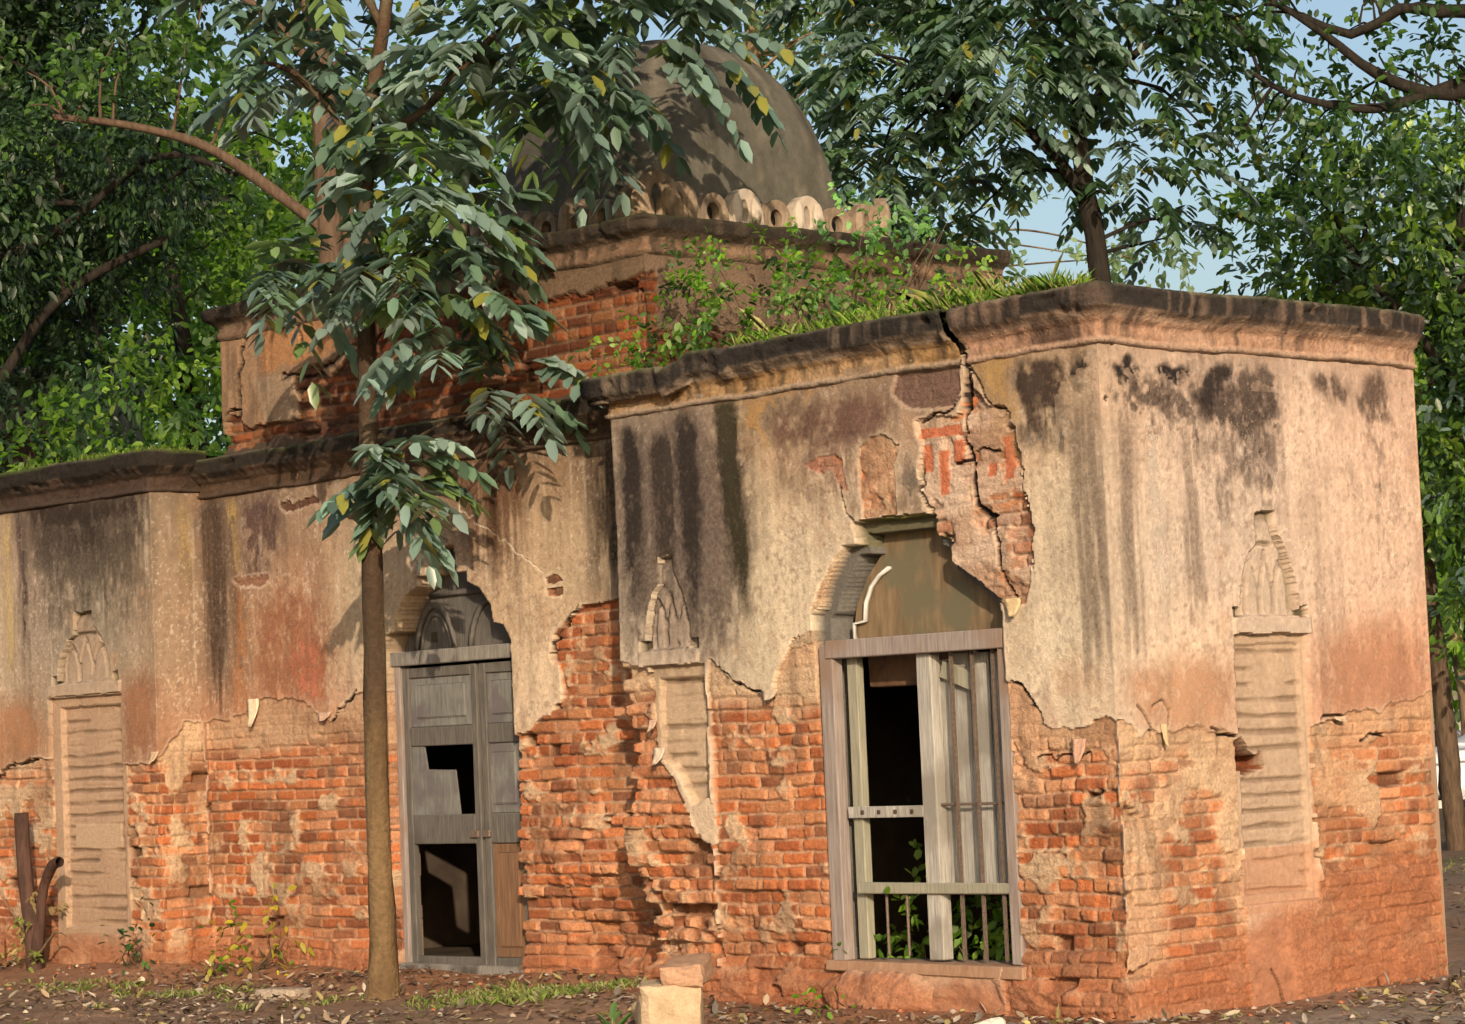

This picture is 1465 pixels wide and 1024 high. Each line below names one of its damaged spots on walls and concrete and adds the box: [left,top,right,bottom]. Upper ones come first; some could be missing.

spalling [227,374,359,450]
spalling [383,287,648,426]
water stain [592,402,749,656]
spalling [893,360,1036,617]
crack [920,303,1035,596]
water stain [1315,374,1388,421]
spalling [0,756,60,964]
spalling [125,692,369,972]
spalling [387,691,424,963]
spalling [516,598,845,1009]
spalling [1007,681,1255,1021]
spalling [1308,690,1448,976]